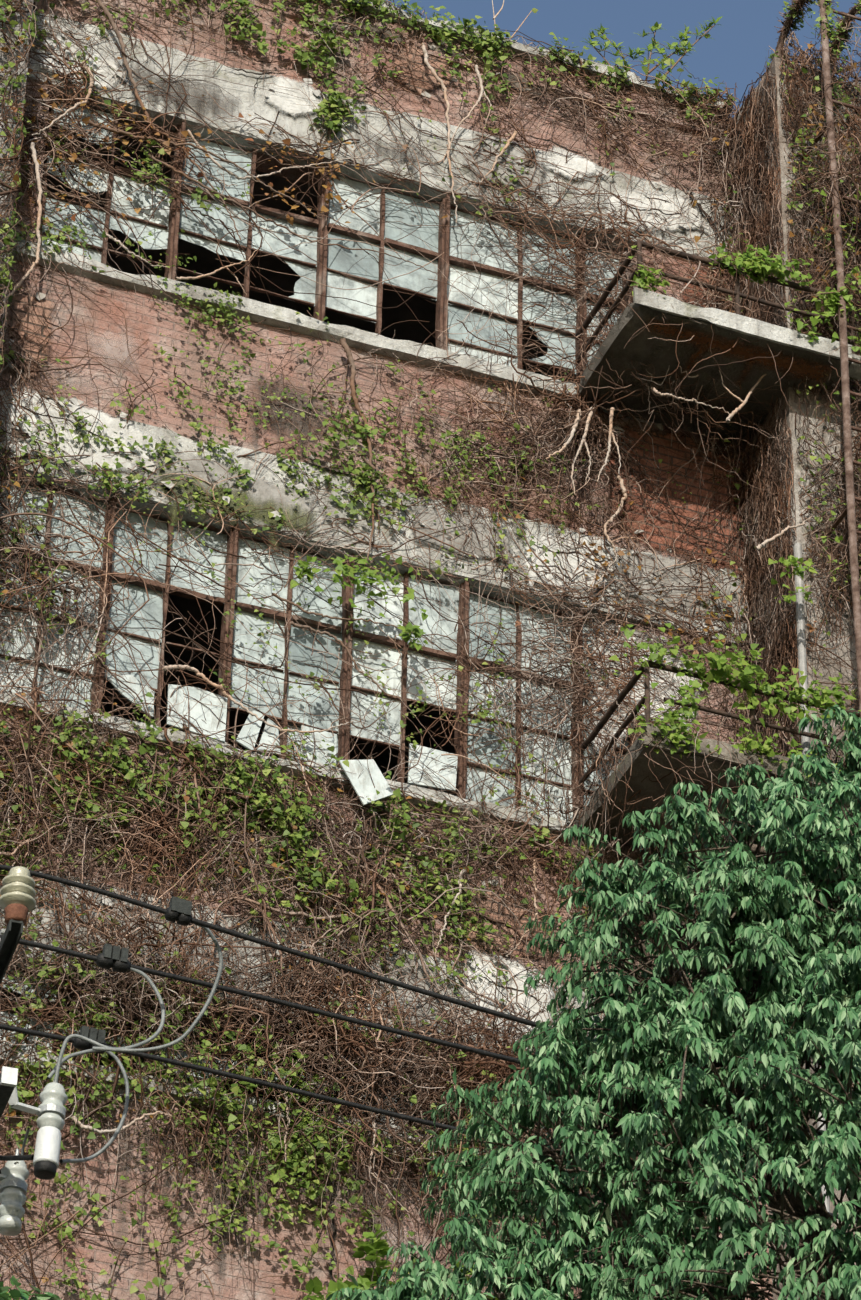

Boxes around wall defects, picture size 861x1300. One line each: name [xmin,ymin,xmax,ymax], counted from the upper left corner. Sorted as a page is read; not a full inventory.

peeling [36,25,127,90]
flaking render [336,10,464,99]
peeling [264,76,321,117]